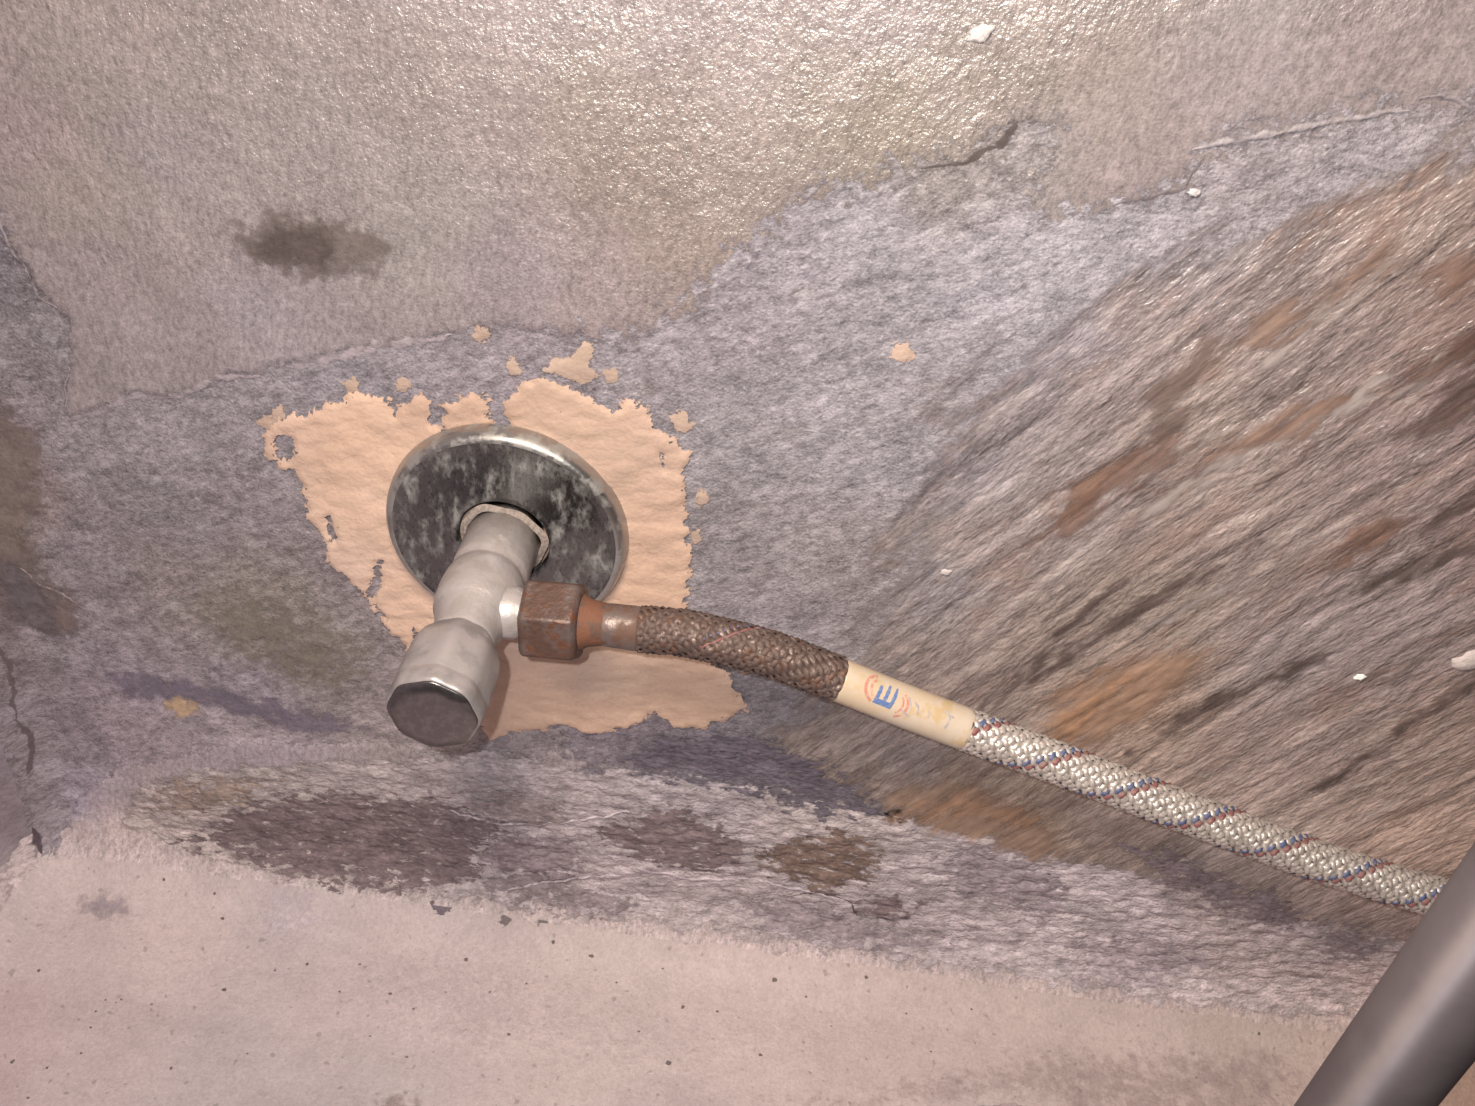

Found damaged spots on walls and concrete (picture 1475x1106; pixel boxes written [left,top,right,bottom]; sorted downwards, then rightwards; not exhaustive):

water stain [236,210,390,279]
water stain [0,401,84,636]
crack [0,648,35,775]
peeling [835,776,871,807]
spalling [865,793,956,826]